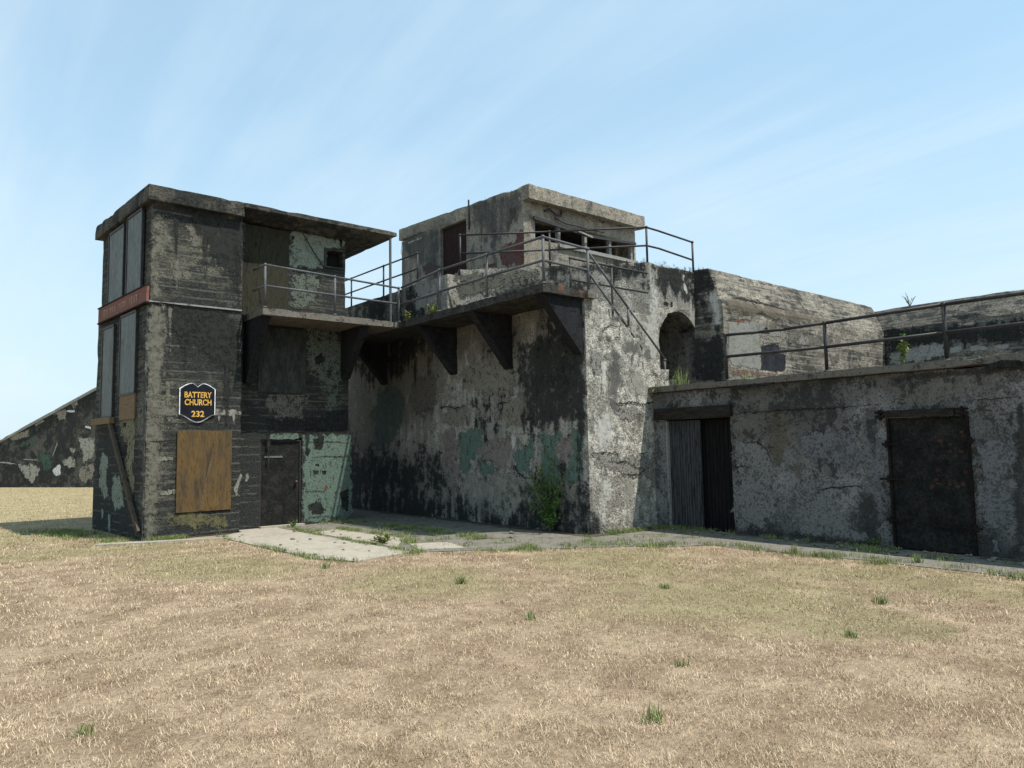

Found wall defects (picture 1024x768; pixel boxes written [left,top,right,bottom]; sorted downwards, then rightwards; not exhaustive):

peeling [289,231,345,310]
water stain [511,261,830,507]
peeling [18,462,40,483]
peeling [264,328,354,524]
water stain [455,473,525,524]
spalling [513,422,649,497]
water stain [595,477,645,524]
crack [593,451,649,475]